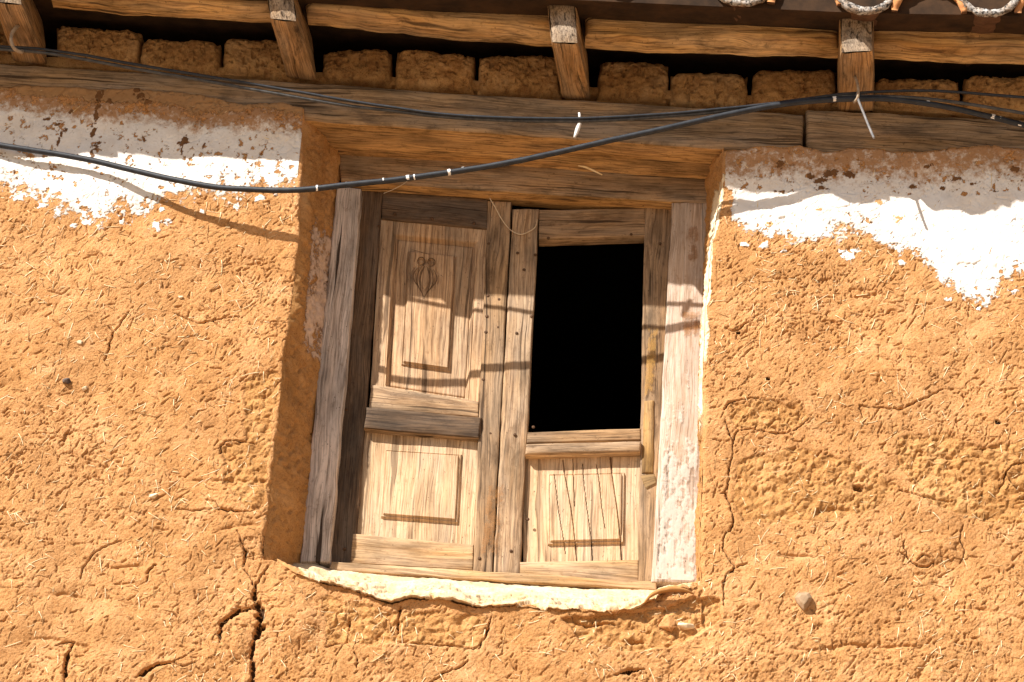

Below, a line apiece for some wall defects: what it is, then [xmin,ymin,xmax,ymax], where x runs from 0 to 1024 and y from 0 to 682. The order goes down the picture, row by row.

peeling [0,90,303,232]
peeling [656,146,1024,580]
crack [859,391,939,418]
crack [179,500,277,682]
crack [722,398,809,603]
crack [901,540,932,568]